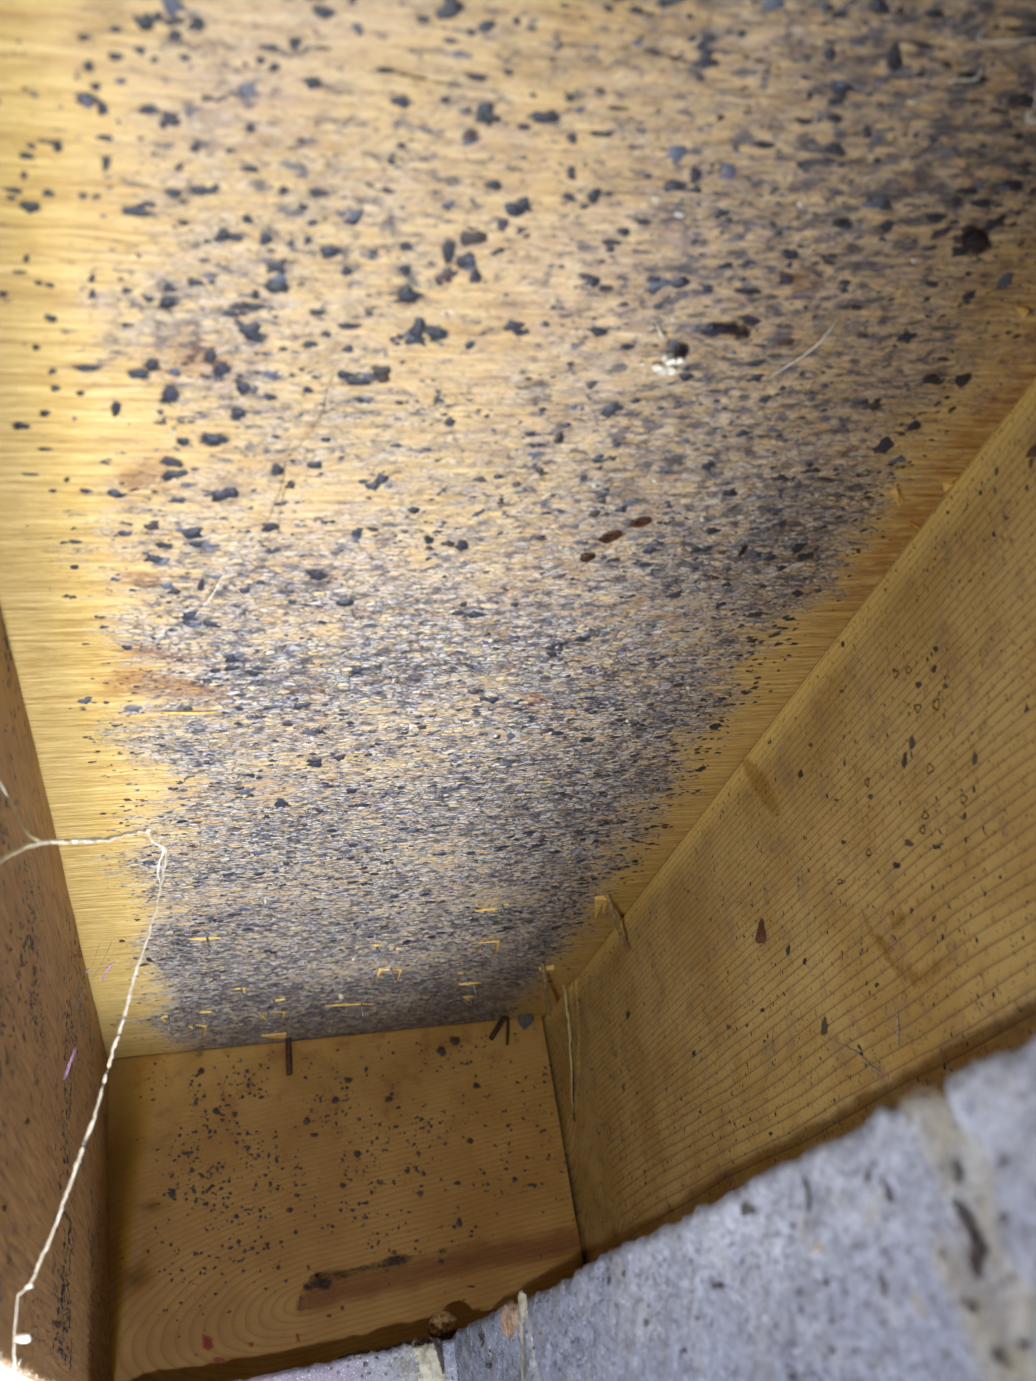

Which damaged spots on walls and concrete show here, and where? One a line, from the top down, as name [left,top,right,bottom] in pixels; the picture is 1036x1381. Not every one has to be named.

damp [57,61,128,217]
damp [109,0,207,70]
mould [137,104,191,129]
damp [416,0,662,147]
damp [604,0,770,115]
damp [751,0,925,242]
damp [500,125,787,367]
damp [117,181,542,447]
mould [48,364,102,396]
mould [111,402,131,425]
mould [338,527,379,552]
mould [357,468,392,500]